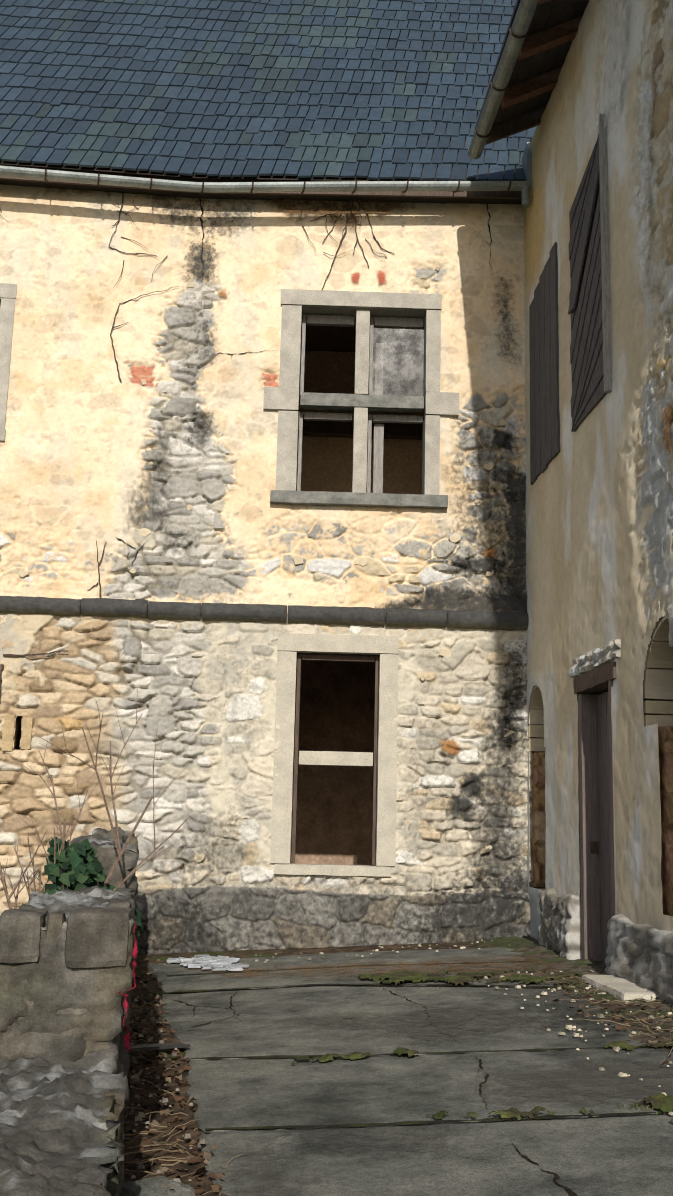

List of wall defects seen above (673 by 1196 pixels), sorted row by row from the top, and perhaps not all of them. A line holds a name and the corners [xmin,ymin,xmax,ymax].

flaking render [103,277,526,603]
flaking render [93,617,533,904]
crack [383,988,489,1109]
crack [515,1146,578,1196]